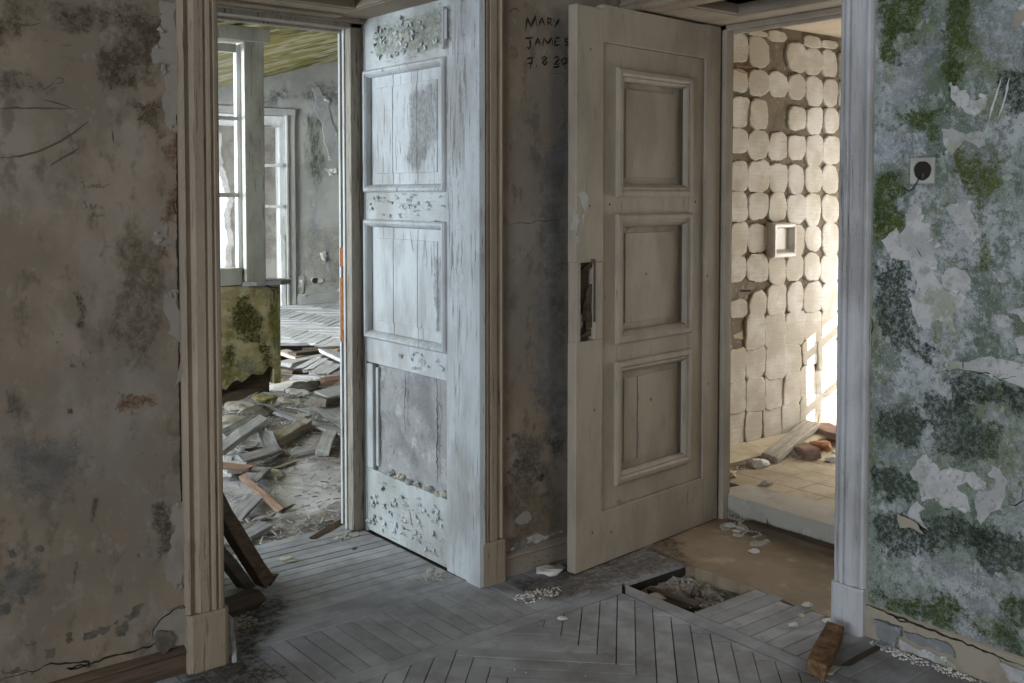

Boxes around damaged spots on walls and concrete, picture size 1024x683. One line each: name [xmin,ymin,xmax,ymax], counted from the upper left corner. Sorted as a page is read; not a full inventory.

damp [56,5,161,88]
flaking render [151,0,177,133]
damp [873,0,1024,271]
peeling [948,82,988,116]
crack [172,115,180,311]
peeling [881,204,971,333]
damp [152,502,171,558]
crack [176,341,184,502]
damp [870,260,1024,657]
peeling [897,454,1008,534]
crack [0,584,186,681]
crack [868,605,1024,667]